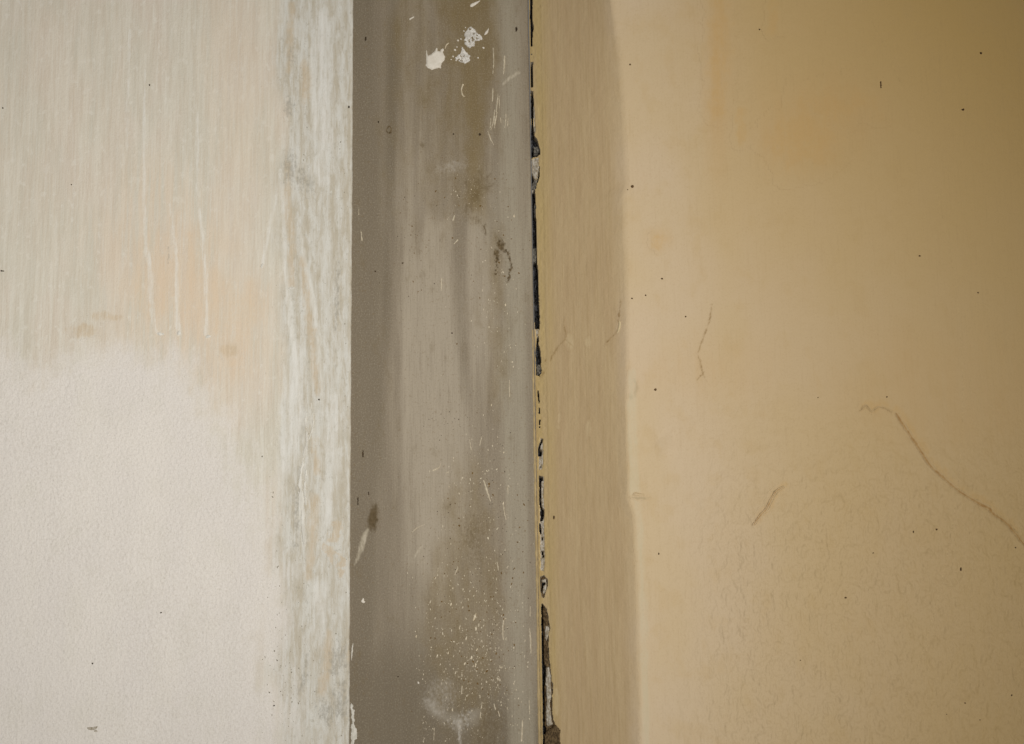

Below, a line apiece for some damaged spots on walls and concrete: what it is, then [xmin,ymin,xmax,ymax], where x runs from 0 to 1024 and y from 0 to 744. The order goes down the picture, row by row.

water stain [62,0,344,407]
crack [696,303,714,382]
flaking render [544,725,561,744]